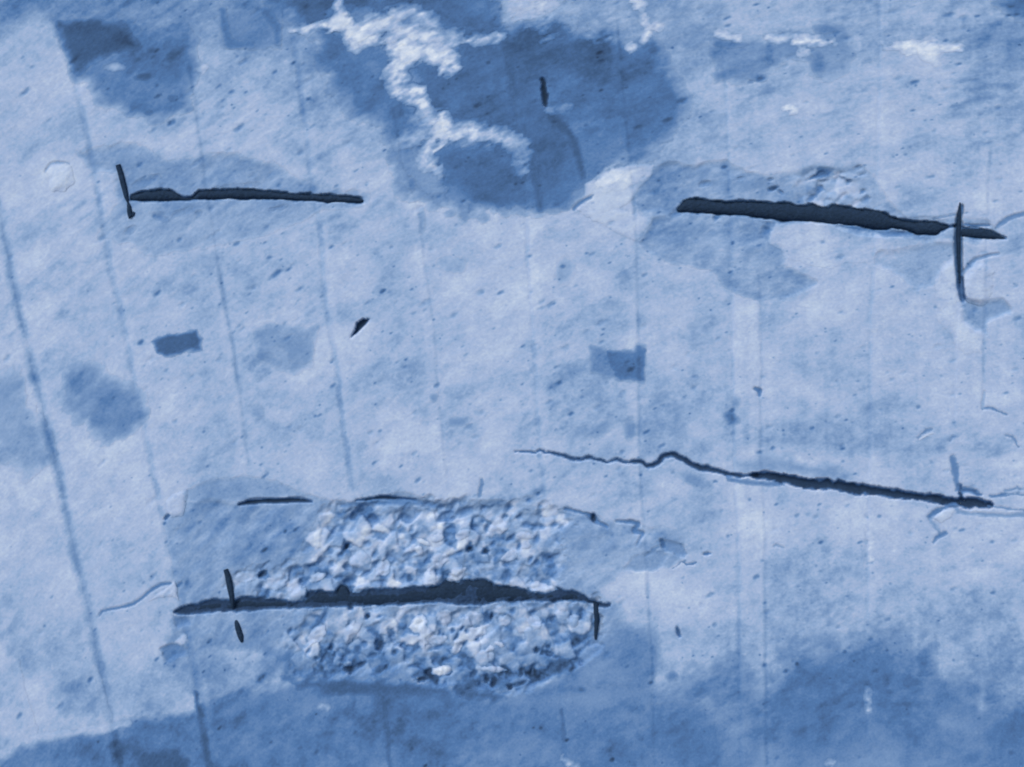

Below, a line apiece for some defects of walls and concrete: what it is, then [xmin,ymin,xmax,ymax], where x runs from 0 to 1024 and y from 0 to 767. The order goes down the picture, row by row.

leakage [49,10,209,125]
leakage [218,0,694,234]
spalling [159,474,689,693]
crack [514,428,1024,544]